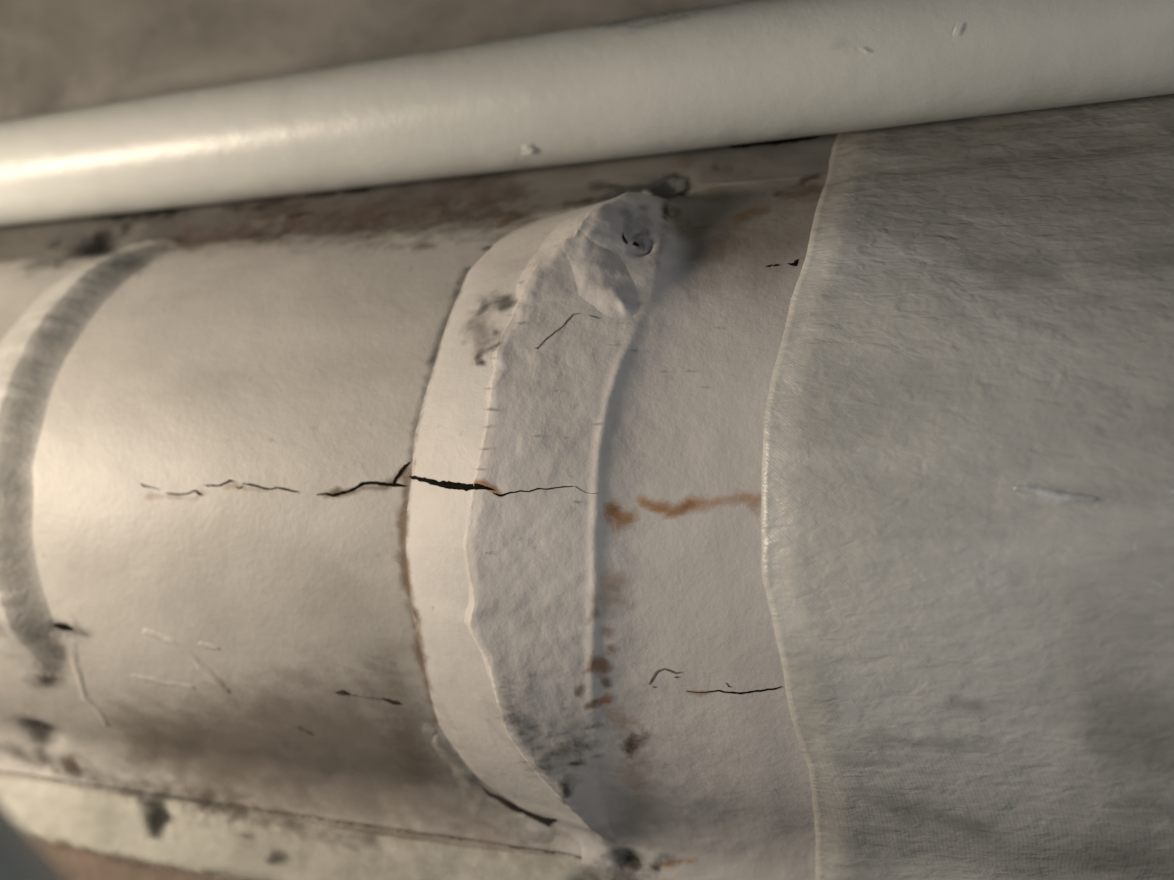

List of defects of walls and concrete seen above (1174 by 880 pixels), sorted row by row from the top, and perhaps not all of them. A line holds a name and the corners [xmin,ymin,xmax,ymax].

crack [140,462,595,497]
crack [52,623,74,631]
corrosion [587,659,609,707]
crack [648,668,782,694]
water stain [32,838,230,880]